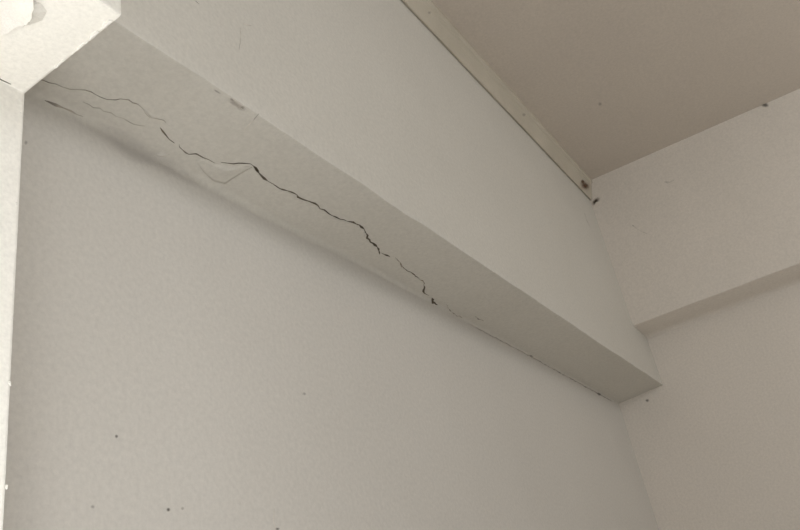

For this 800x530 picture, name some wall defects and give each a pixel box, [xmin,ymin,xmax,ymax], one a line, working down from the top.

crack [42,80,611,401]